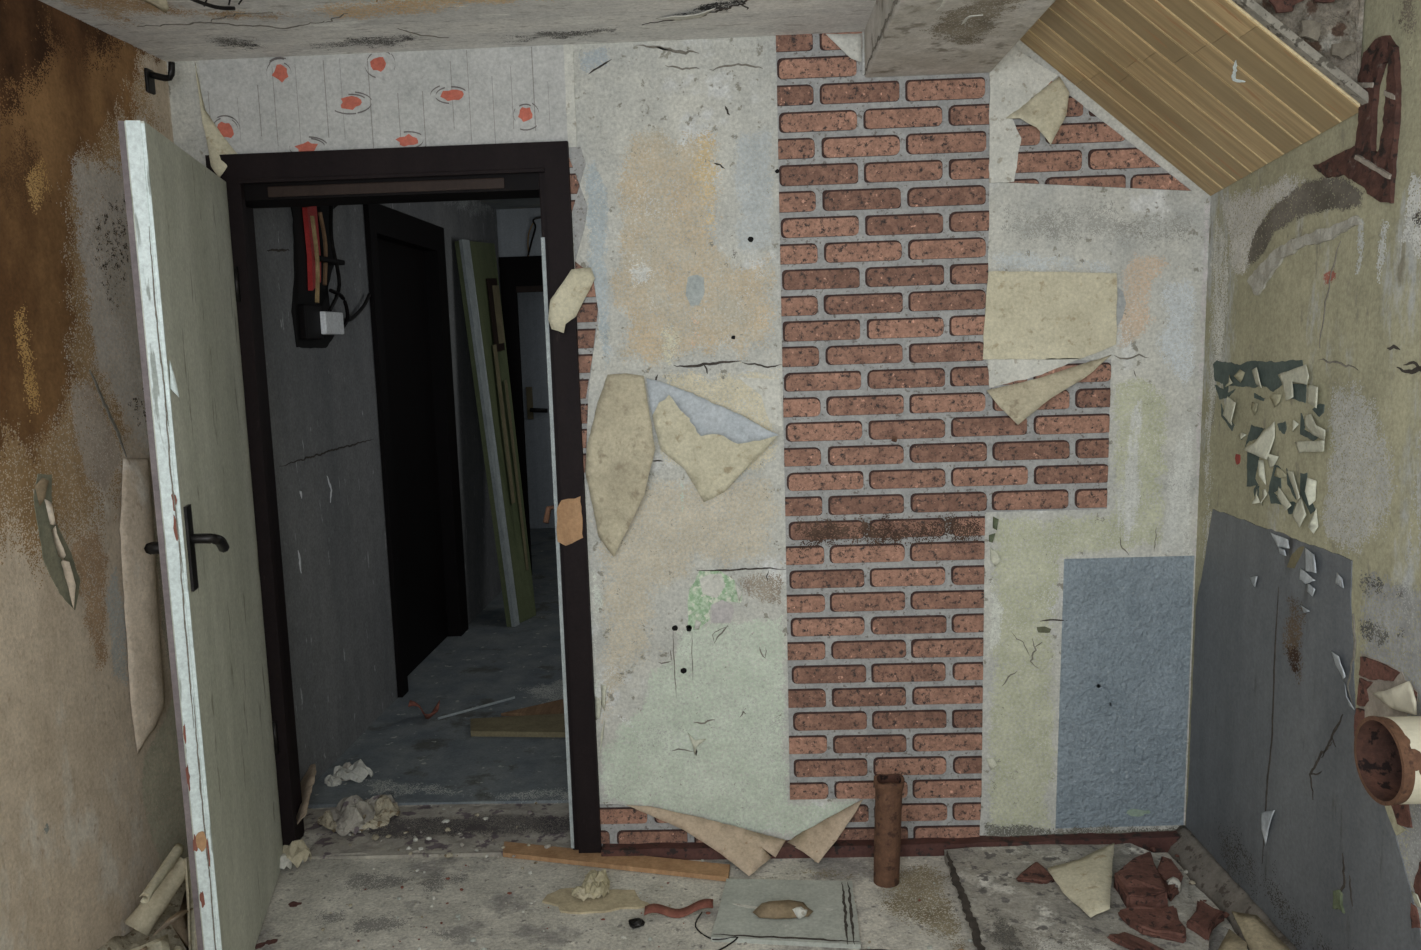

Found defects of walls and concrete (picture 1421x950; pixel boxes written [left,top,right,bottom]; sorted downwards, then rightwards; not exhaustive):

leakage [497,25,617,43]
crack [589,0,763,74]
leakage [0,0,554,685]
crack [1387,345,1421,374]
peeling [1213,360,1326,613]
peeling [35,477,76,608]
crack [1309,714,1343,800]